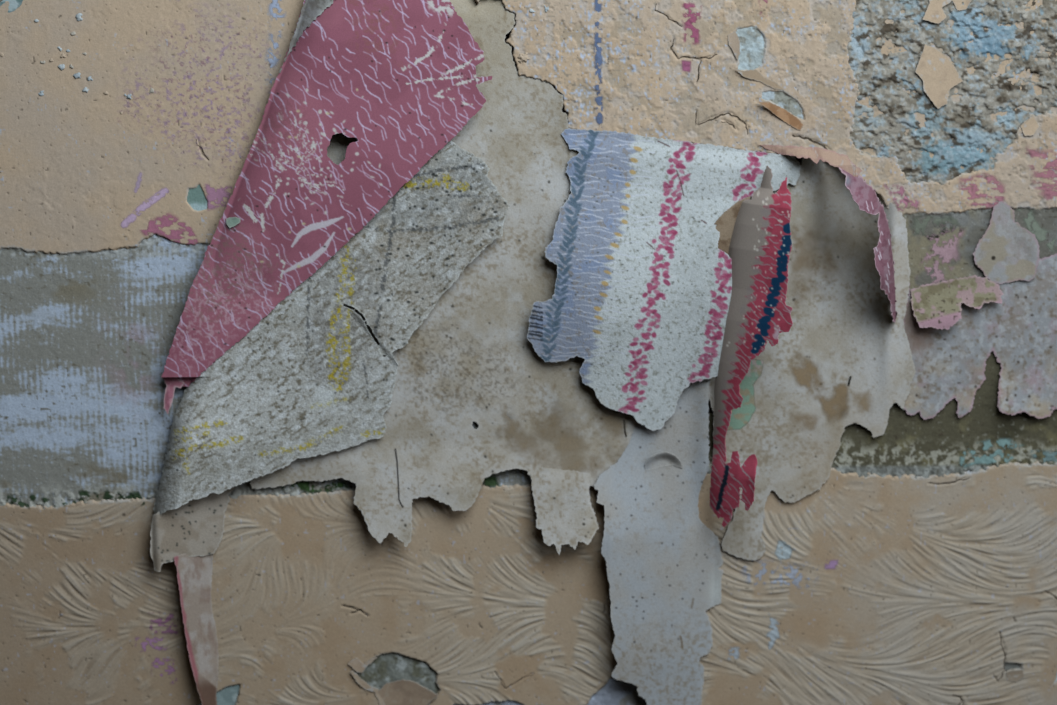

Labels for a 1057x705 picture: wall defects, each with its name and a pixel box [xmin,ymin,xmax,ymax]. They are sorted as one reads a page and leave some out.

spalling [848,0,1057,185]
peeling [187,185,207,211]
peeling [226,217,240,228]
peeling [902,208,997,298]
peeling [1013,207,1057,259]
peeling [0,234,210,509]
peeling [728,360,763,430]
peeling [831,351,1057,479]
peeling [228,478,356,499]
peeling [482,468,532,488]
spalling [348,652,439,705]